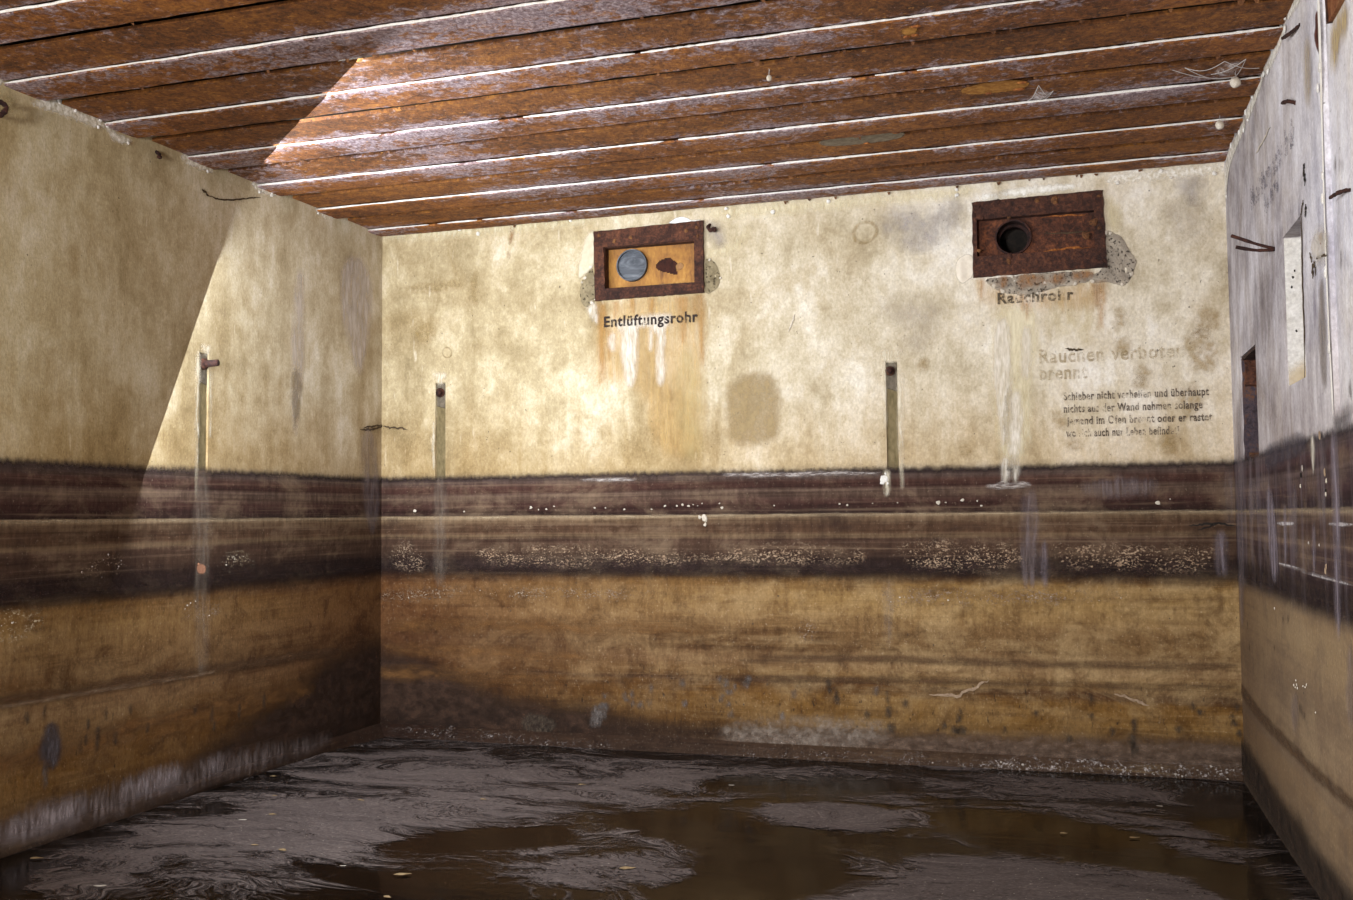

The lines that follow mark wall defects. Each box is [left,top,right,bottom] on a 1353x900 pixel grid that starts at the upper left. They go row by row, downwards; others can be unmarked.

damp [0,0,1353,623]
flaking render [956,230,1136,295]
damp [0,646,635,838]